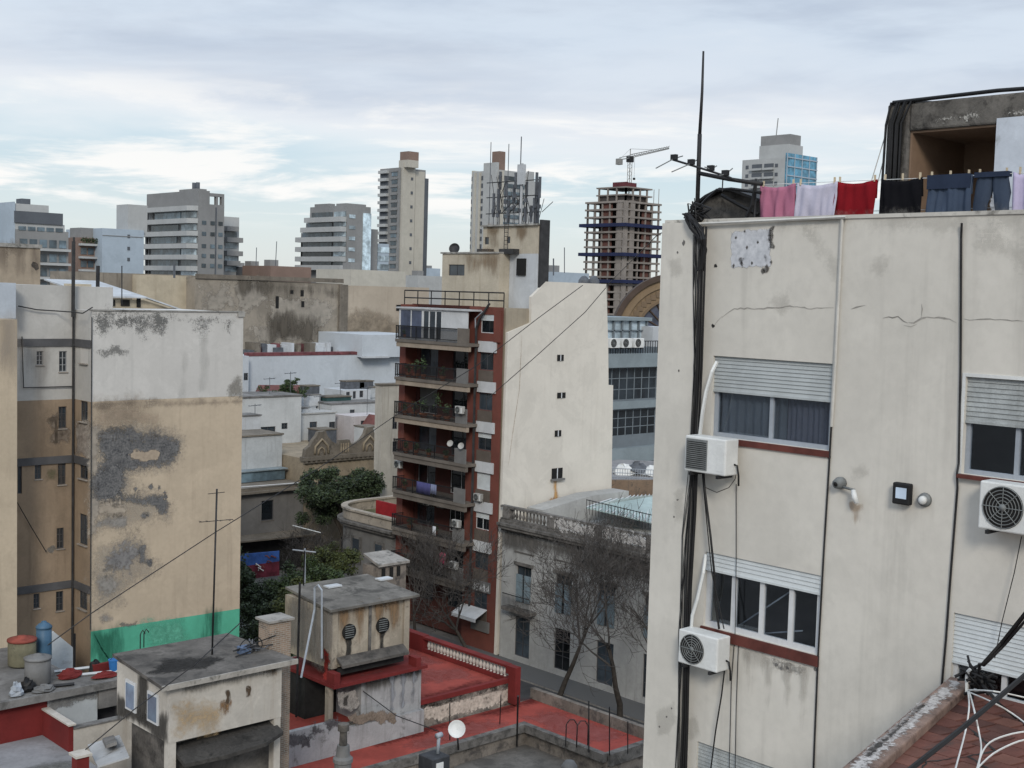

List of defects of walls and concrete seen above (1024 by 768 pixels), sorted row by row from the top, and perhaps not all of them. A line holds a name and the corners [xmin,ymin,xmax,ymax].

peeling [731,229,772,274]
water stain [94,312,167,334]
crack [715,305,822,324]
crack [852,304,1020,327]